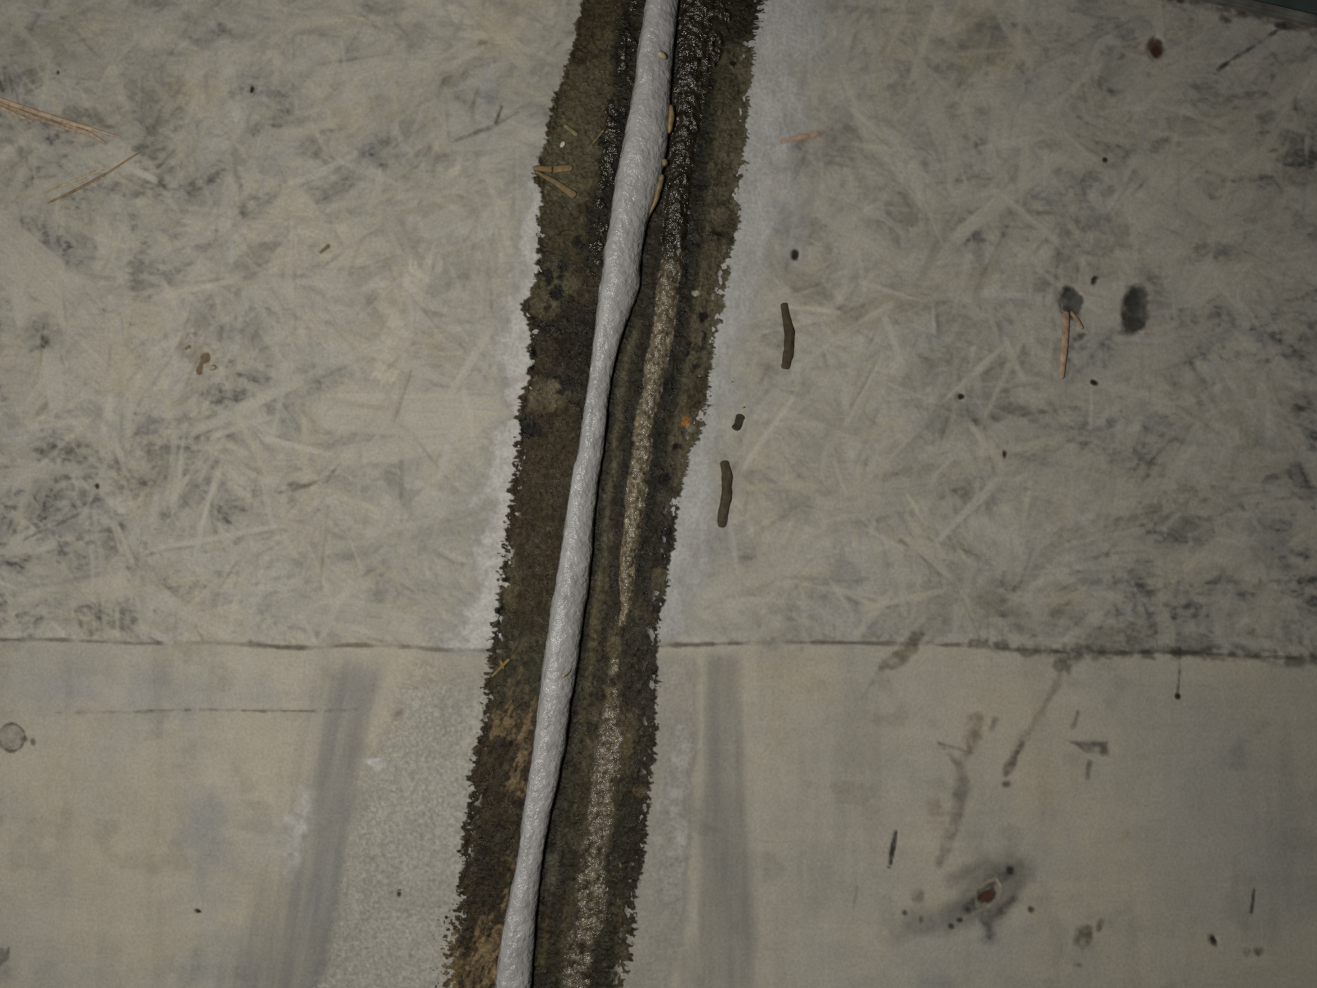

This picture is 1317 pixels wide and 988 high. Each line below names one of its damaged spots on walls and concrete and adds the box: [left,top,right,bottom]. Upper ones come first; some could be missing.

damp [433,0,646,988]
damp [531,0,767,988]
rust [949,868,1012,928]